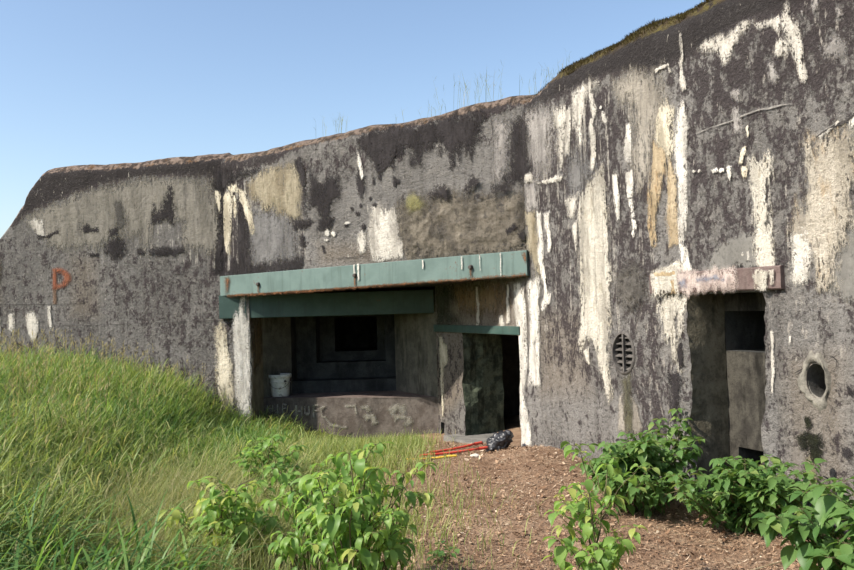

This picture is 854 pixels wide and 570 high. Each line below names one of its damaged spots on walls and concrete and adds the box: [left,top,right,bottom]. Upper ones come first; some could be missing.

crack [696,103,791,134]
water stain [350,107,488,231]
water stain [490,112,533,196]
water stain [80,201,187,261]
water stain [151,186,176,226]
water stain [212,155,342,276]
water stain [505,223,525,241]
corrosion [225,269,526,318]